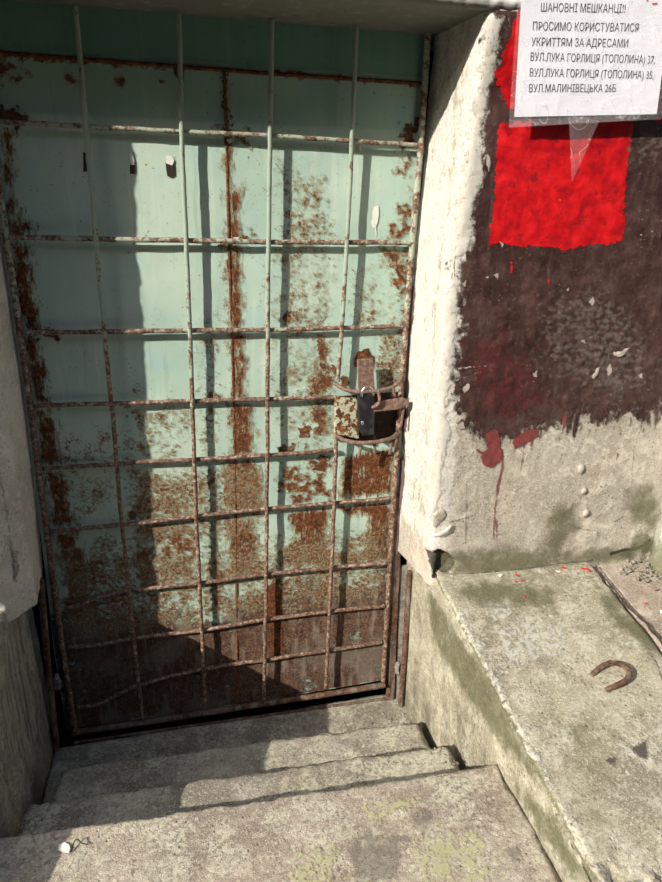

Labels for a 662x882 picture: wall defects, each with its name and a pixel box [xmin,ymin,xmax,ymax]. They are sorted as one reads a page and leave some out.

rust [0,50,185,88]
rust [391,117,420,176]
rust [349,188,413,391]
rust [0,73,394,729]